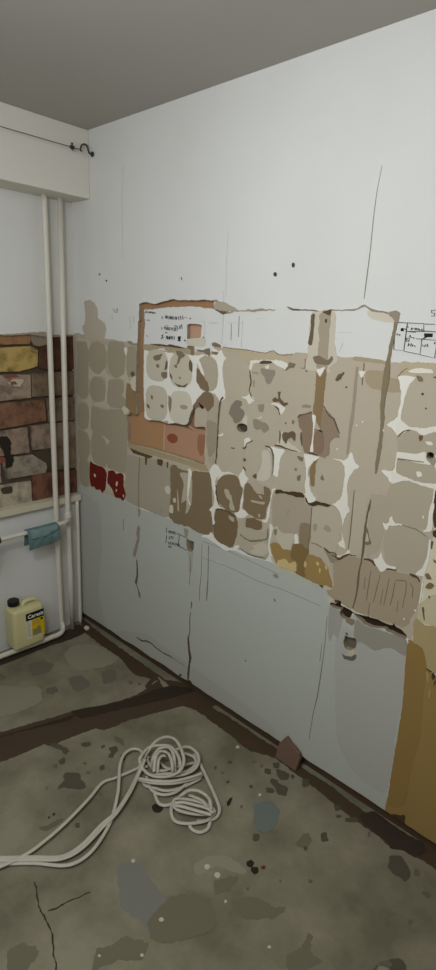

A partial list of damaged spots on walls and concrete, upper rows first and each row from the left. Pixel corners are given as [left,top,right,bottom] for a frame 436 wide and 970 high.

crack [151,342,184,350]
crack [212,168,424,474]
peeling [0,300,436,641]
crack [199,397,269,558]
crack [224,347,420,582]
crack [402,491,436,549]
crack [136,545,209,680]
crack [309,585,407,739]
crack [34,882,90,970]